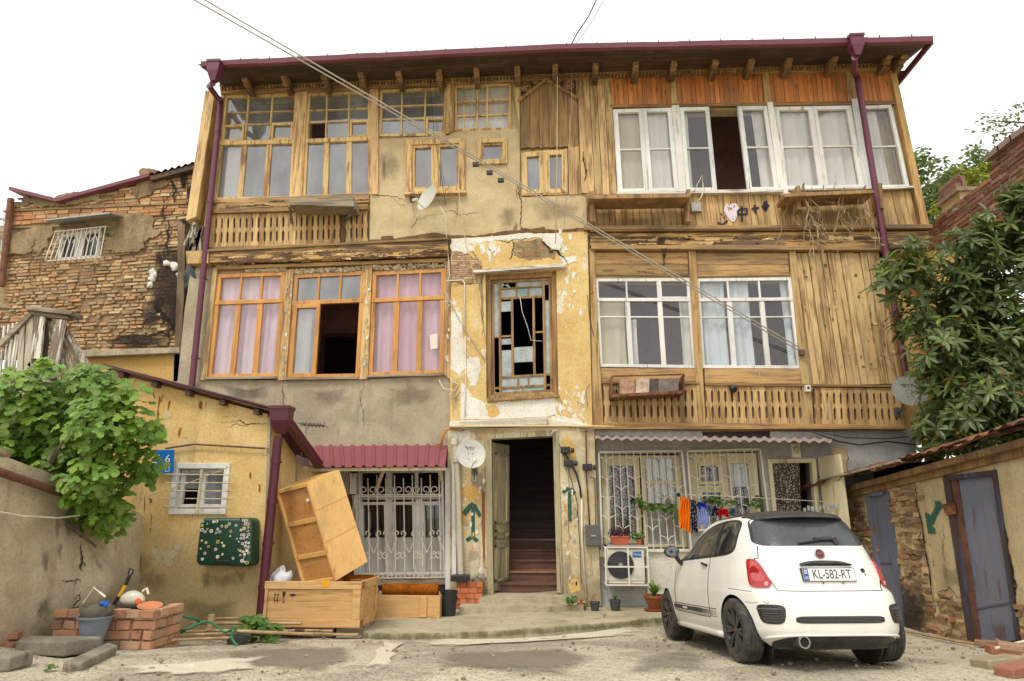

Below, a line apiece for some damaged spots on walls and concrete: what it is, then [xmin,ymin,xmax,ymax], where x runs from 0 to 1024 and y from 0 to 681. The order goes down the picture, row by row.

crack [161,178,186,250]
crack [496,186,567,261]
peeling [216,227,589,593]
crack [914,484,961,612]